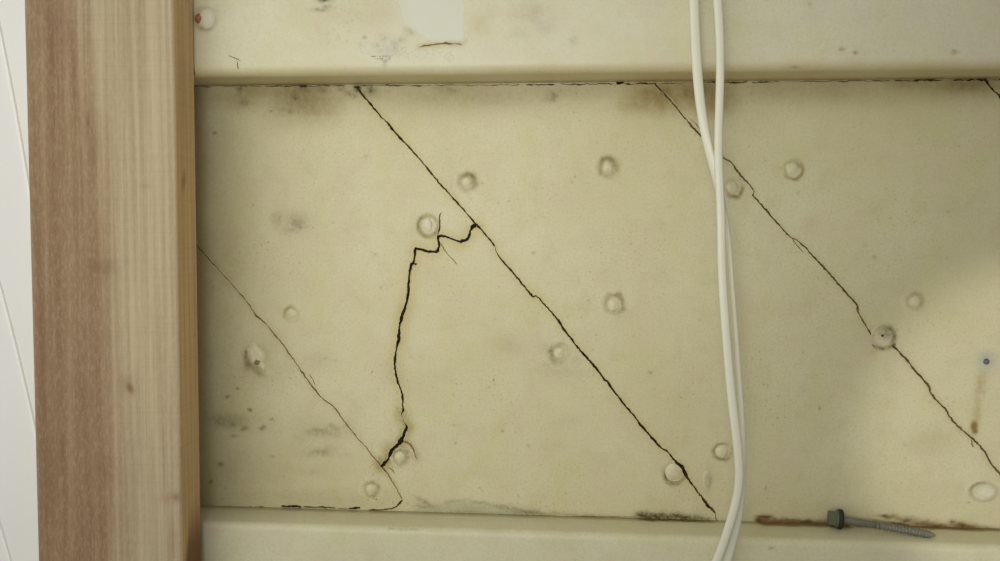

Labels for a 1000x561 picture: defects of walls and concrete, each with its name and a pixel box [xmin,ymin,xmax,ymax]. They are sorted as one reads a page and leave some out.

peeling [358,0,465,62]
crack [194,56,1000,520]
rust [756,516,848,527]
rust [892,522,977,530]